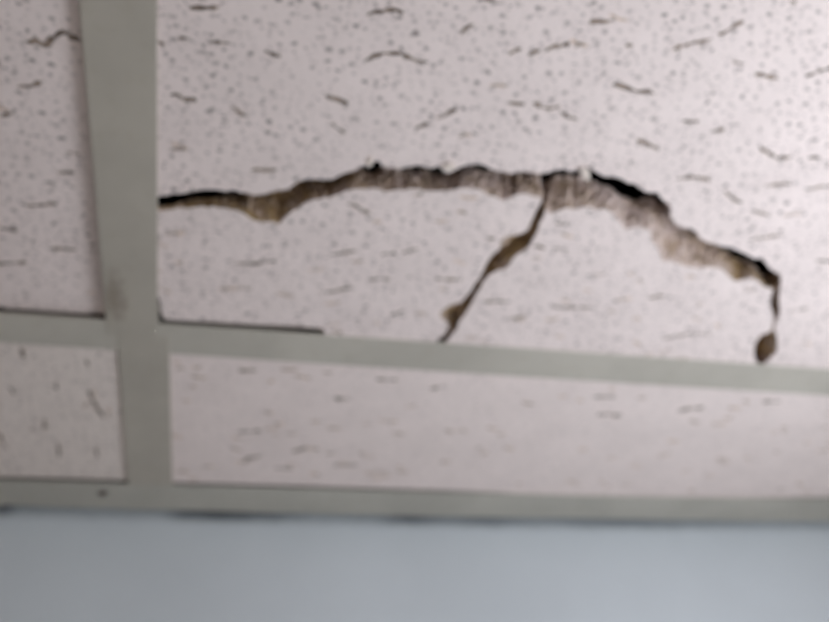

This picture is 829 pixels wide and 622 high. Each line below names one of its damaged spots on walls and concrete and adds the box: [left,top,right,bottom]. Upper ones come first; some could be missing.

crack [443,315,459,340]
crack [158,157,780,333]